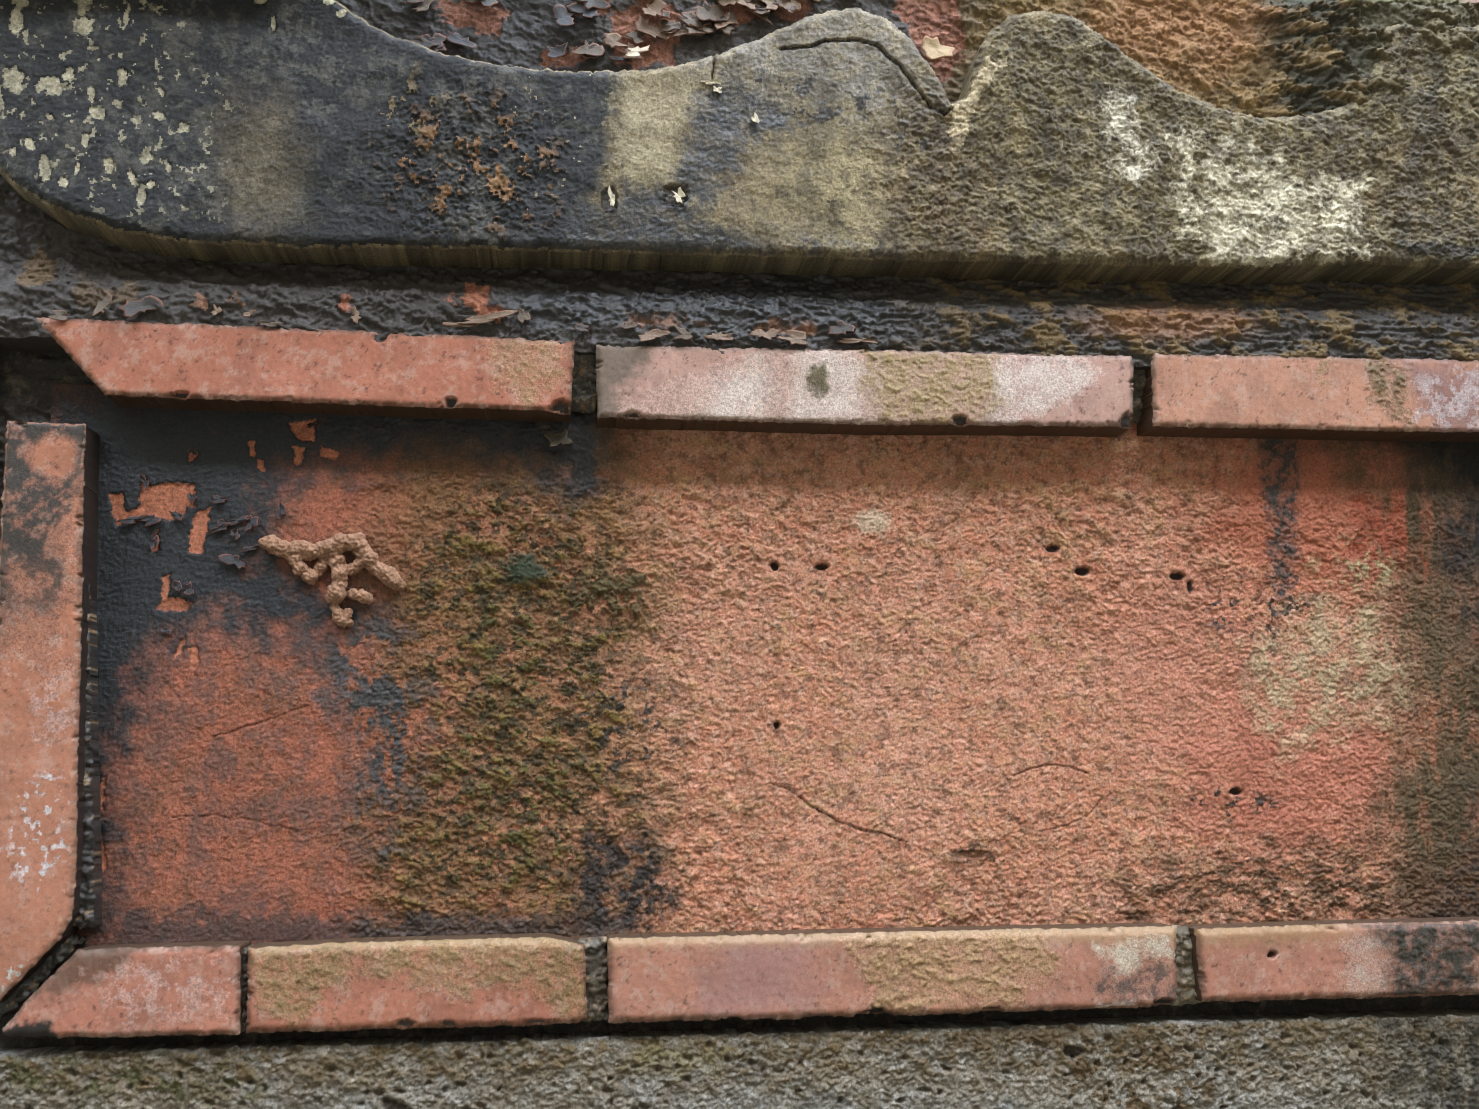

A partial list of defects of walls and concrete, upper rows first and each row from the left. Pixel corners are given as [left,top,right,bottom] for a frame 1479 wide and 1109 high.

peeling [8,0,29,34]
peeling [0,65,105,188]
peeling [72,0,99,50]
peeling [103,150,172,209]
peeling [360,0,821,245]
crack [779,38,954,117]
peeling [892,0,969,83]
water stain [1090,78,1479,268]
peeling [108,474,286,569]
peeling [155,574,200,670]
water stain [295,602,446,860]
crack [770,782,908,843]